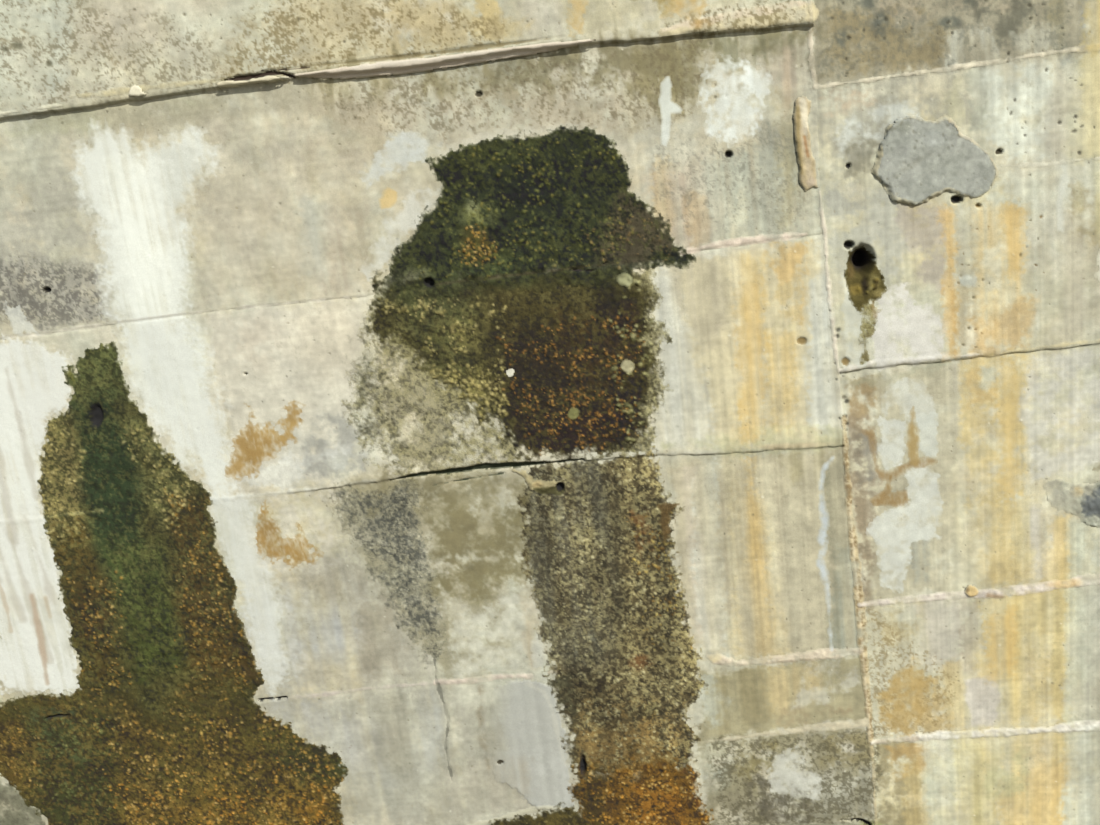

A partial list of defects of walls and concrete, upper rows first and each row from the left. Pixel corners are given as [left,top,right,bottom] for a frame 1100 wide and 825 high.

crack [224,37,551,81]
damp [358,120,599,190]
spalling [871,114,999,205]
damp [359,185,443,282]
damp [0,300,80,702]
damp [67,117,293,703]
rust [224,399,306,482]
rust [253,499,325,571]
crack [390,458,584,486]
spalling [1044,478,1100,528]
crack [433,656,453,781]
damp [0,781,46,825]